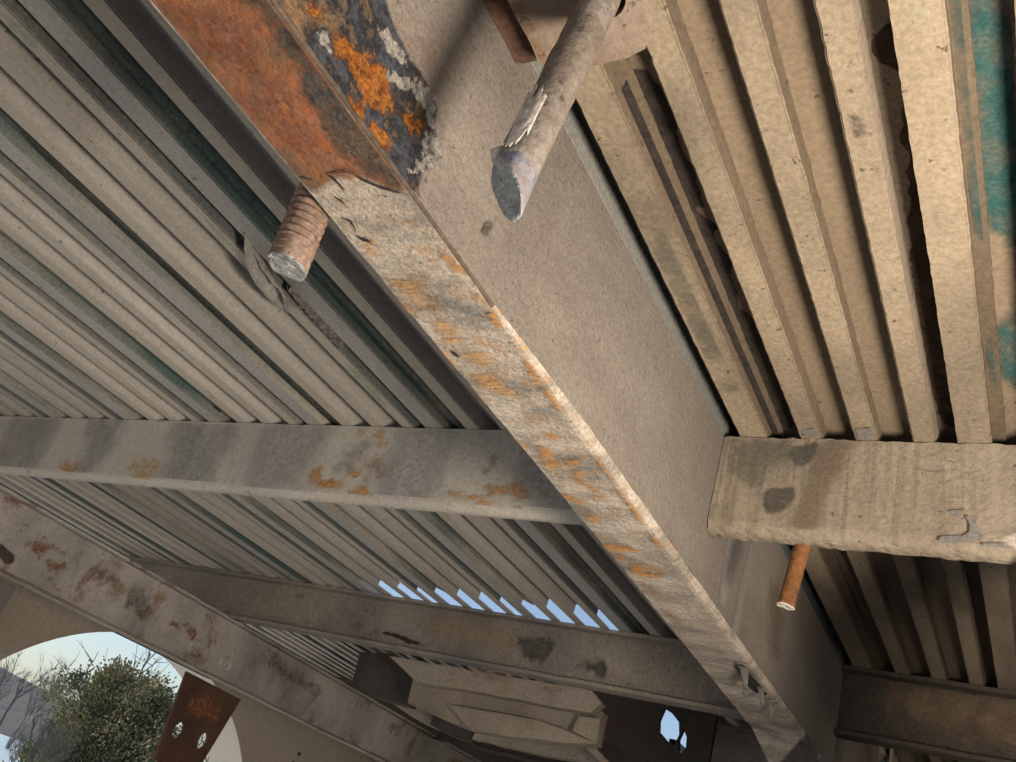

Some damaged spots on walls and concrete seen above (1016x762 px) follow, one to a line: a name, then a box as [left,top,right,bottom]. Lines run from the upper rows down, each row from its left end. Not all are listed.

corrosion [152,0,426,191]
crack [334,196,373,245]
corrosion [525,361,559,409]
corrosion [309,462,390,495]
corrosion [521,433,603,503]
water stain [764,443,846,530]
corrosion [0,544,14,564]
corrosion [605,545,660,593]
water stain [519,637,554,664]
water stain [586,661,606,677]